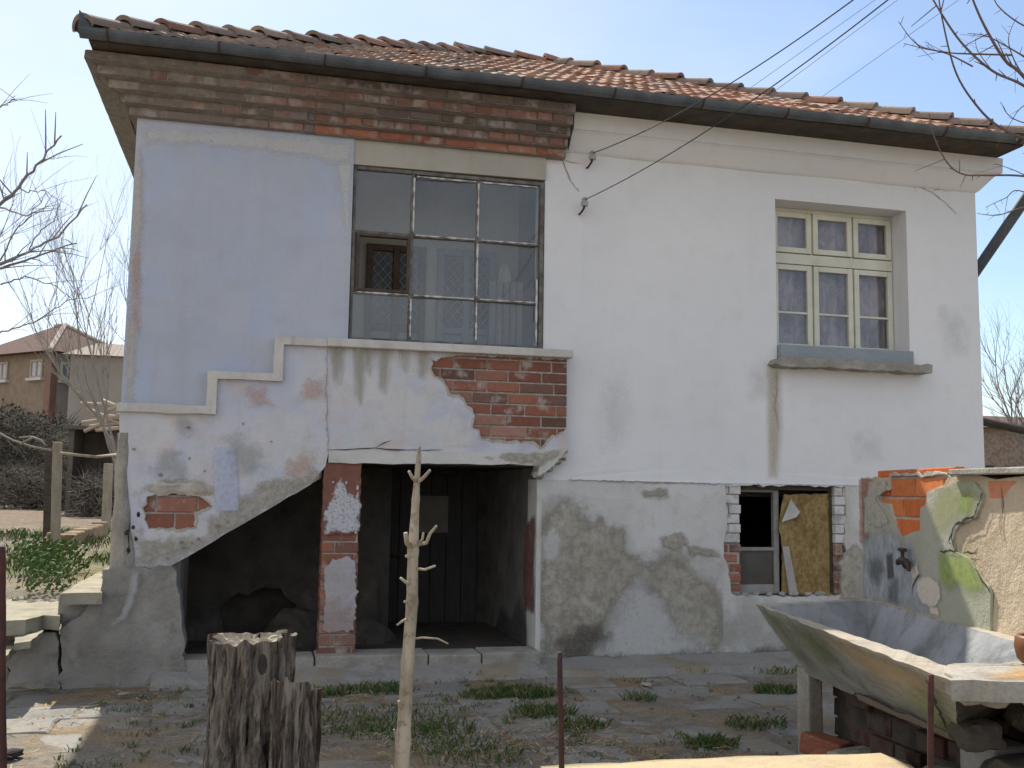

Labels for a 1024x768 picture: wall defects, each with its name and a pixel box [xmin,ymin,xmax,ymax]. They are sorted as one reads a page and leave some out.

crack [325,350,431,452]
flaking render [430,353,567,466]
peeling [116,448,320,621]
peeling [324,480,362,534]
flaking render [724,543,741,596]
flaking render [833,544,846,595]
flaking render [878,467,968,538]
crack [939,488,1003,593]
flaking render [988,481,1017,498]